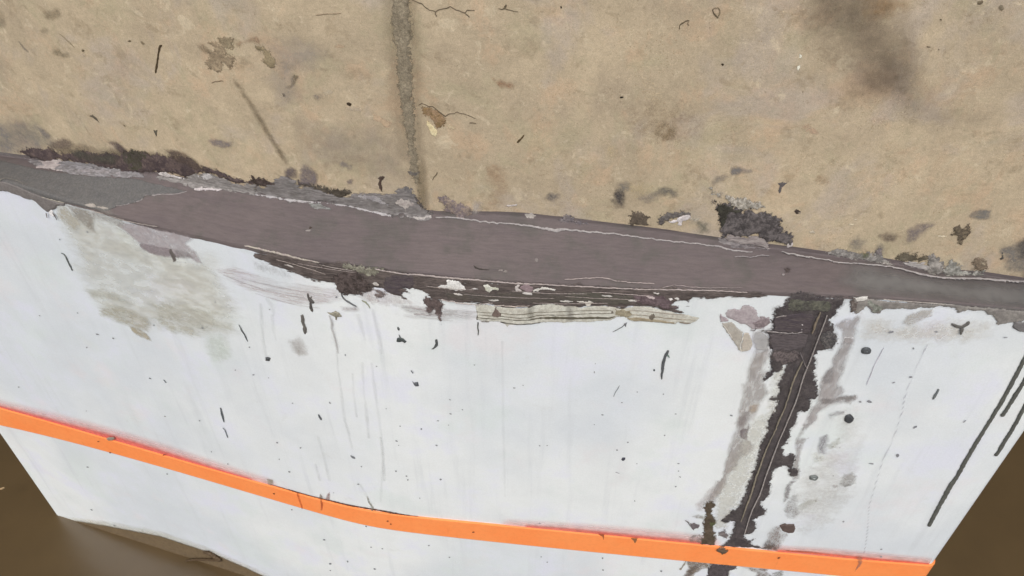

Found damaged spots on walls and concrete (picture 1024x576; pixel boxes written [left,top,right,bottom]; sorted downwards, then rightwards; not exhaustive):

spalling [708,187,794,250]
peeling [439,279,699,327]
peeling [722,322,753,351]